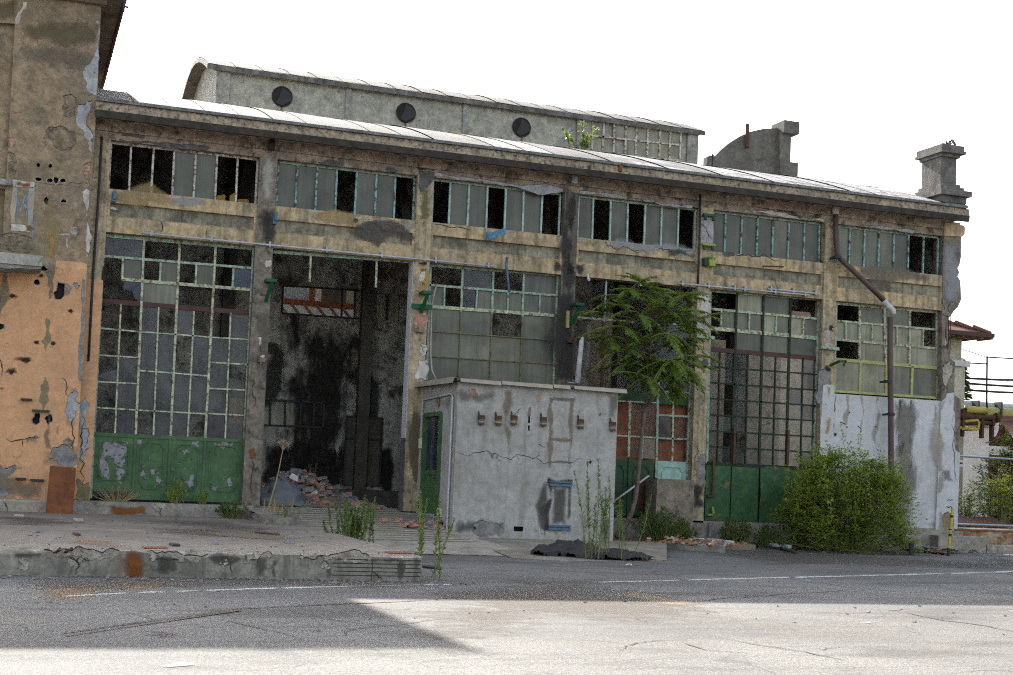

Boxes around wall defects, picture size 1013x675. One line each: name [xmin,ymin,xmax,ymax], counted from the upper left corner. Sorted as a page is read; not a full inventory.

leakage [0,2,14,18]
flaking render [43,19,100,253]
peeling [44,279,199,500]
crack [458,444,608,464]
leakage [547,398,574,465]
leakage [895,400,916,518]
leakage [932,406,950,492]
leakage [537,479,572,530]
spalling [44,546,119,576]
rust [126,551,142,577]
spalling [147,549,208,564]
spalling [300,549,372,572]